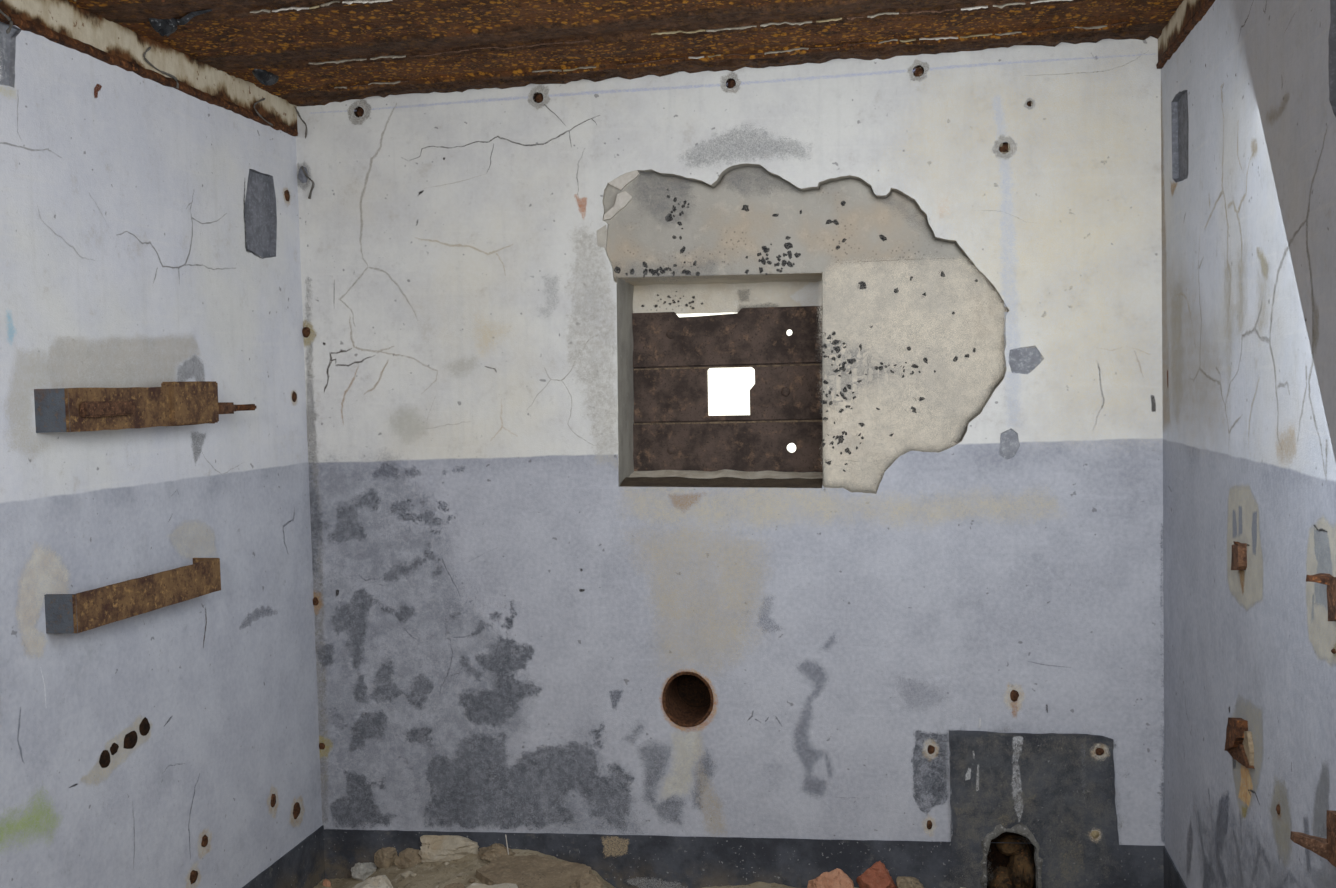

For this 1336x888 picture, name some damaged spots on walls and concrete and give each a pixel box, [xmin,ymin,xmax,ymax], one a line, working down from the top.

peeling [0,9,298,136]
peeling [250,0,392,13]
peeling [309,39,589,65]
peeling [527,66,596,110]
peeling [651,0,1072,35]
peeling [616,21,1129,66]
peeling [1156,0,1215,69]
crack [89,193,234,285]
crack [324,104,605,446]
crack [1184,83,1327,481]
flaking render [597,163,1044,494]
water stain [305,278,719,835]